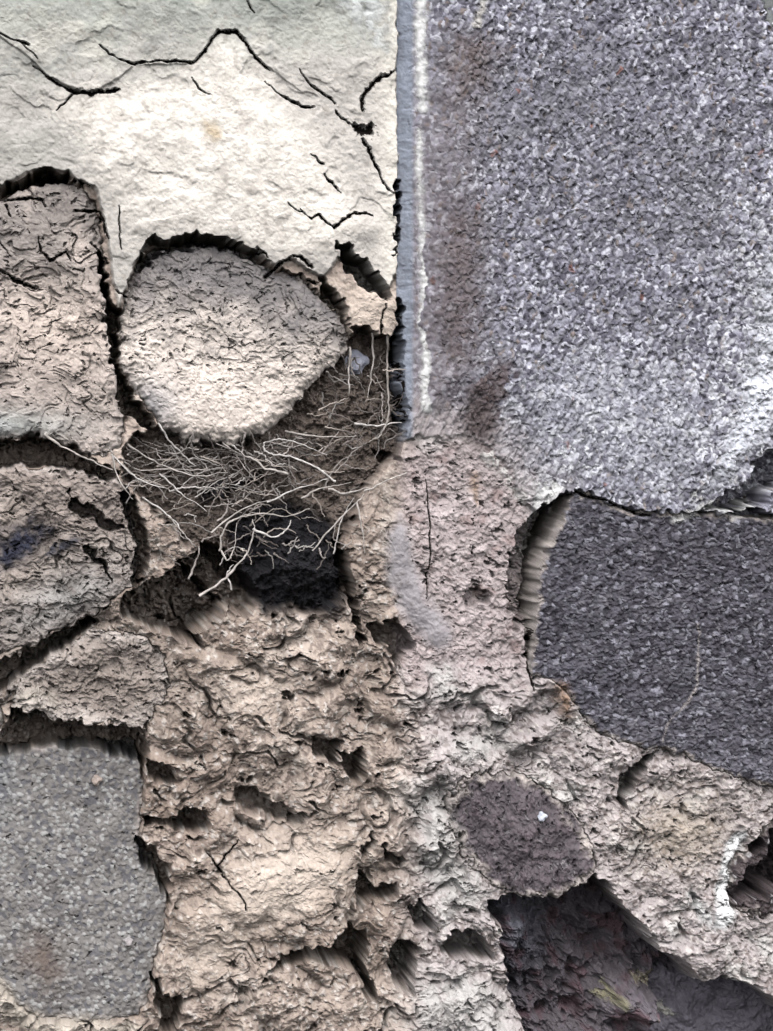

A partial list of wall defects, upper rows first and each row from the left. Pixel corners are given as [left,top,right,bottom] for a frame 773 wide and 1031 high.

crack [0,33,119,111]
crack [100,1,394,194]
crack [4,197,46,217]
crack [38,179,122,264]
crack [290,154,373,229]
crack [0,243,41,290]
crack [255,247,316,285]
crack [574,491,650,517]
spalling [487,873,773,1031]